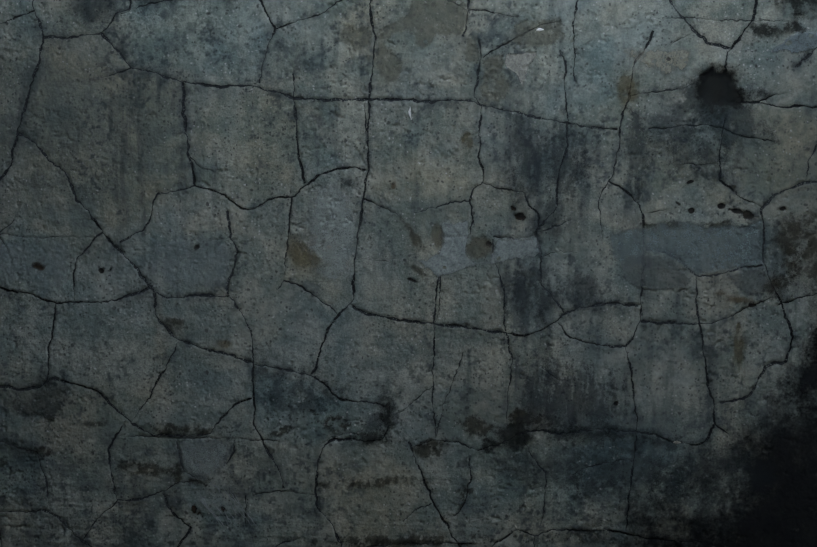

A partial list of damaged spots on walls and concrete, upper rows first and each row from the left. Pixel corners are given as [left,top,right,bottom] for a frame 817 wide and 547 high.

crack [665,0,790,72]
leakage [694,65,770,114]
crack [744,93,817,109]
crack [0,0,654,419]
crack [709,118,755,203]
leakage [765,211,817,298]
crack [0,209,383,499]
crack [558,180,817,446]
leakage [460,408,548,453]
crack [0,425,192,547]
crack [311,433,362,547]
crack [403,441,473,547]